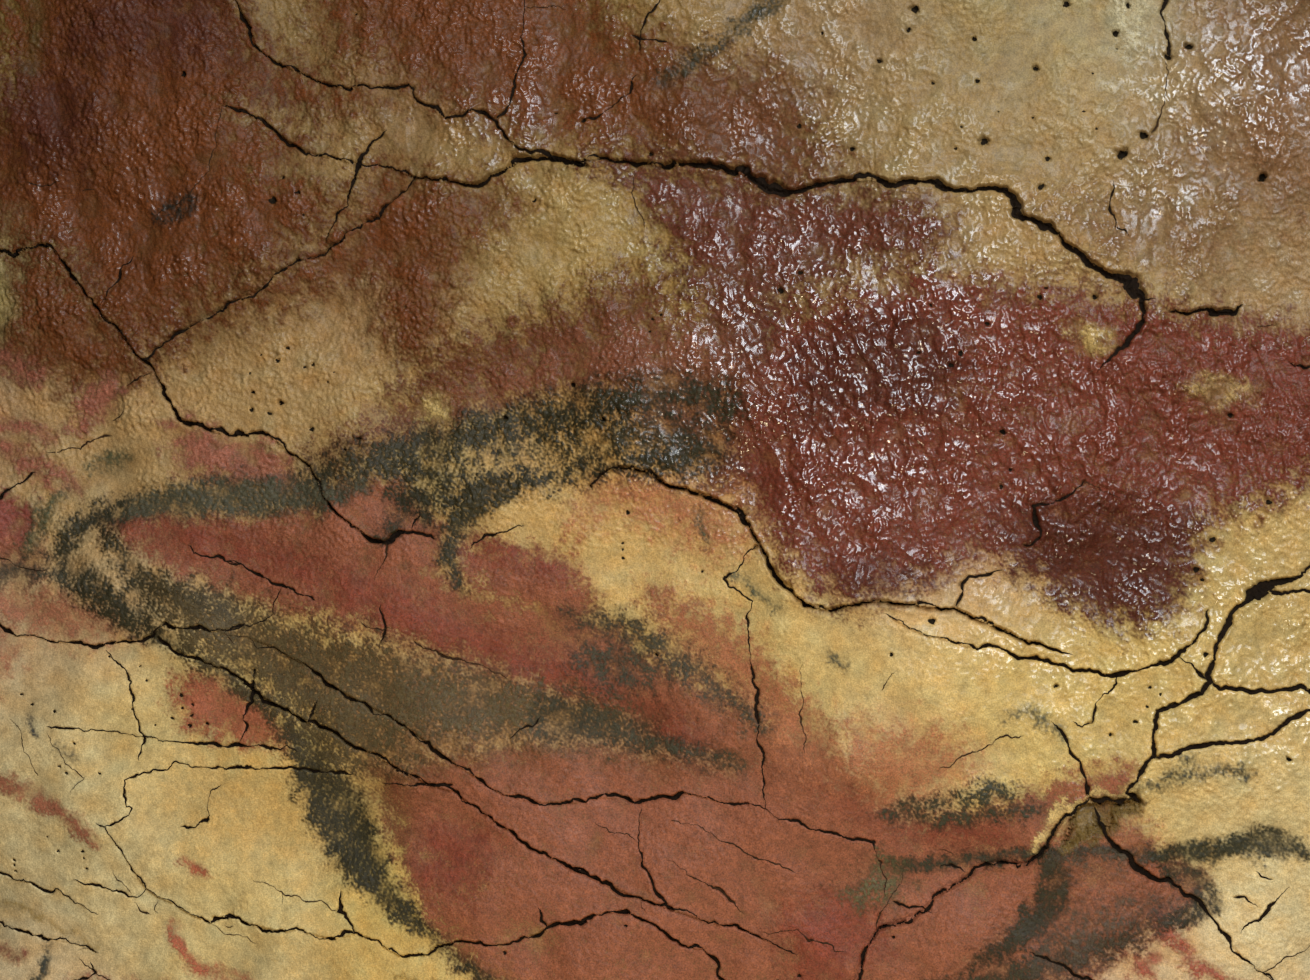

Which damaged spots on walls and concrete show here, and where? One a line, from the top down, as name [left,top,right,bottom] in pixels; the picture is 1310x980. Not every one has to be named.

crack [0,0,1275,679]
crack [0,465,1310,980]